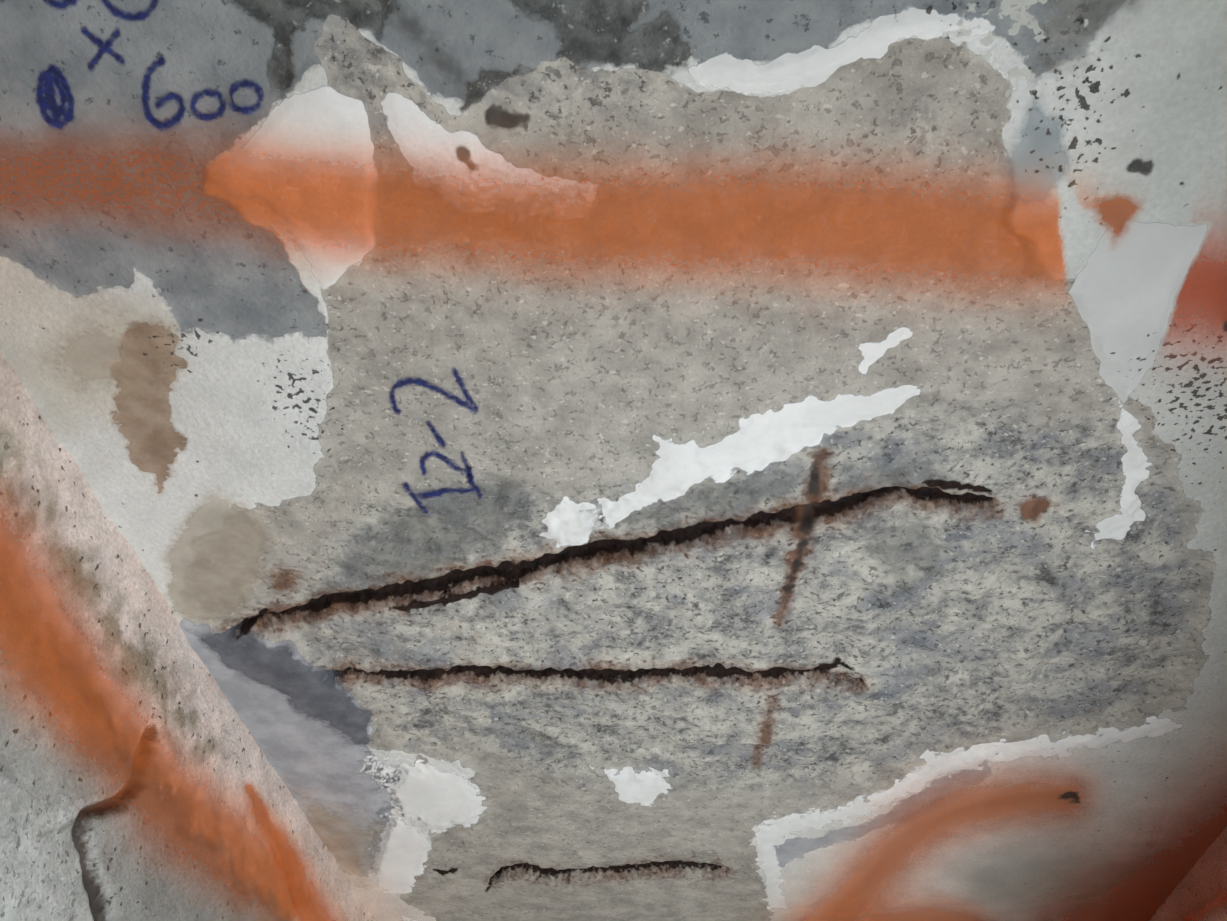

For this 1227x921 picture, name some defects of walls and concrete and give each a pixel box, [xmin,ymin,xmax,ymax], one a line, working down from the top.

spalling [0,0,1134,341]
water stain [63,322,187,494]
peeling [1167,353,1227,439]
crack [223,480,1002,641]
spalling [179,197,1216,921]
rust [776,449,831,627]
crack [143,725,158,744]
crack [329,658,866,689]
rust [753,697,774,765]
crack [71,791,124,921]
crack [433,868,457,876]
crack [485,860,730,891]